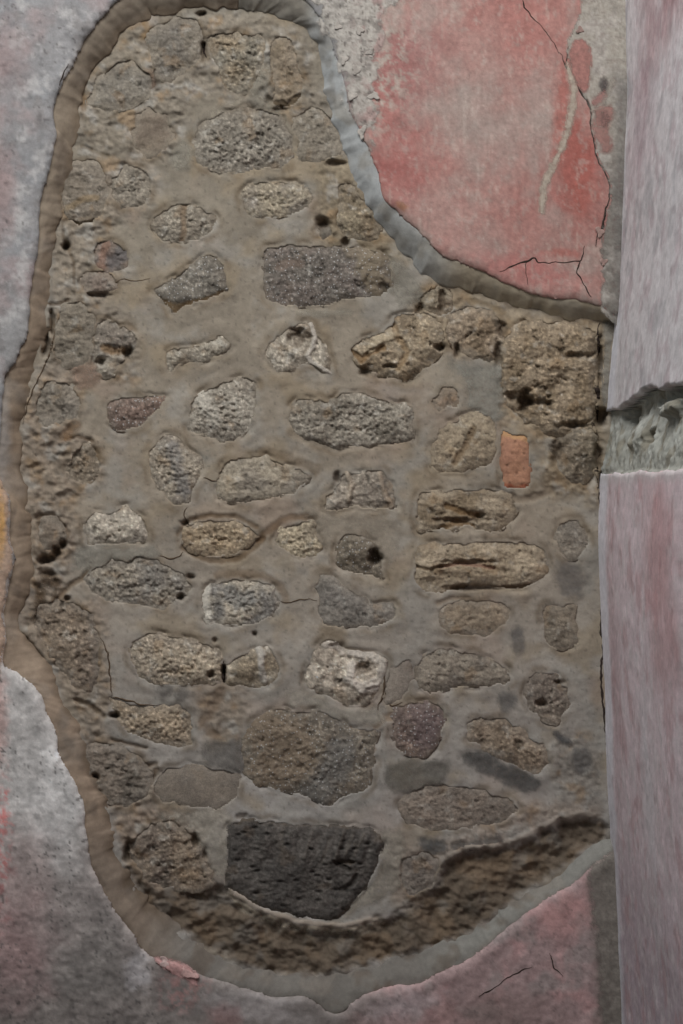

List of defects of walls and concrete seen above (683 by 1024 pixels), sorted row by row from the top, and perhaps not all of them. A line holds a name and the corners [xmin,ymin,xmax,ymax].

spalling [238,0,610,339]
crack [500,1,610,297]
peeling [566,0,627,325]
spalling [601,386,683,474]
peeling [155,956,199,986]
crack [480,955,563,996]
peeling [587,849,622,1024]